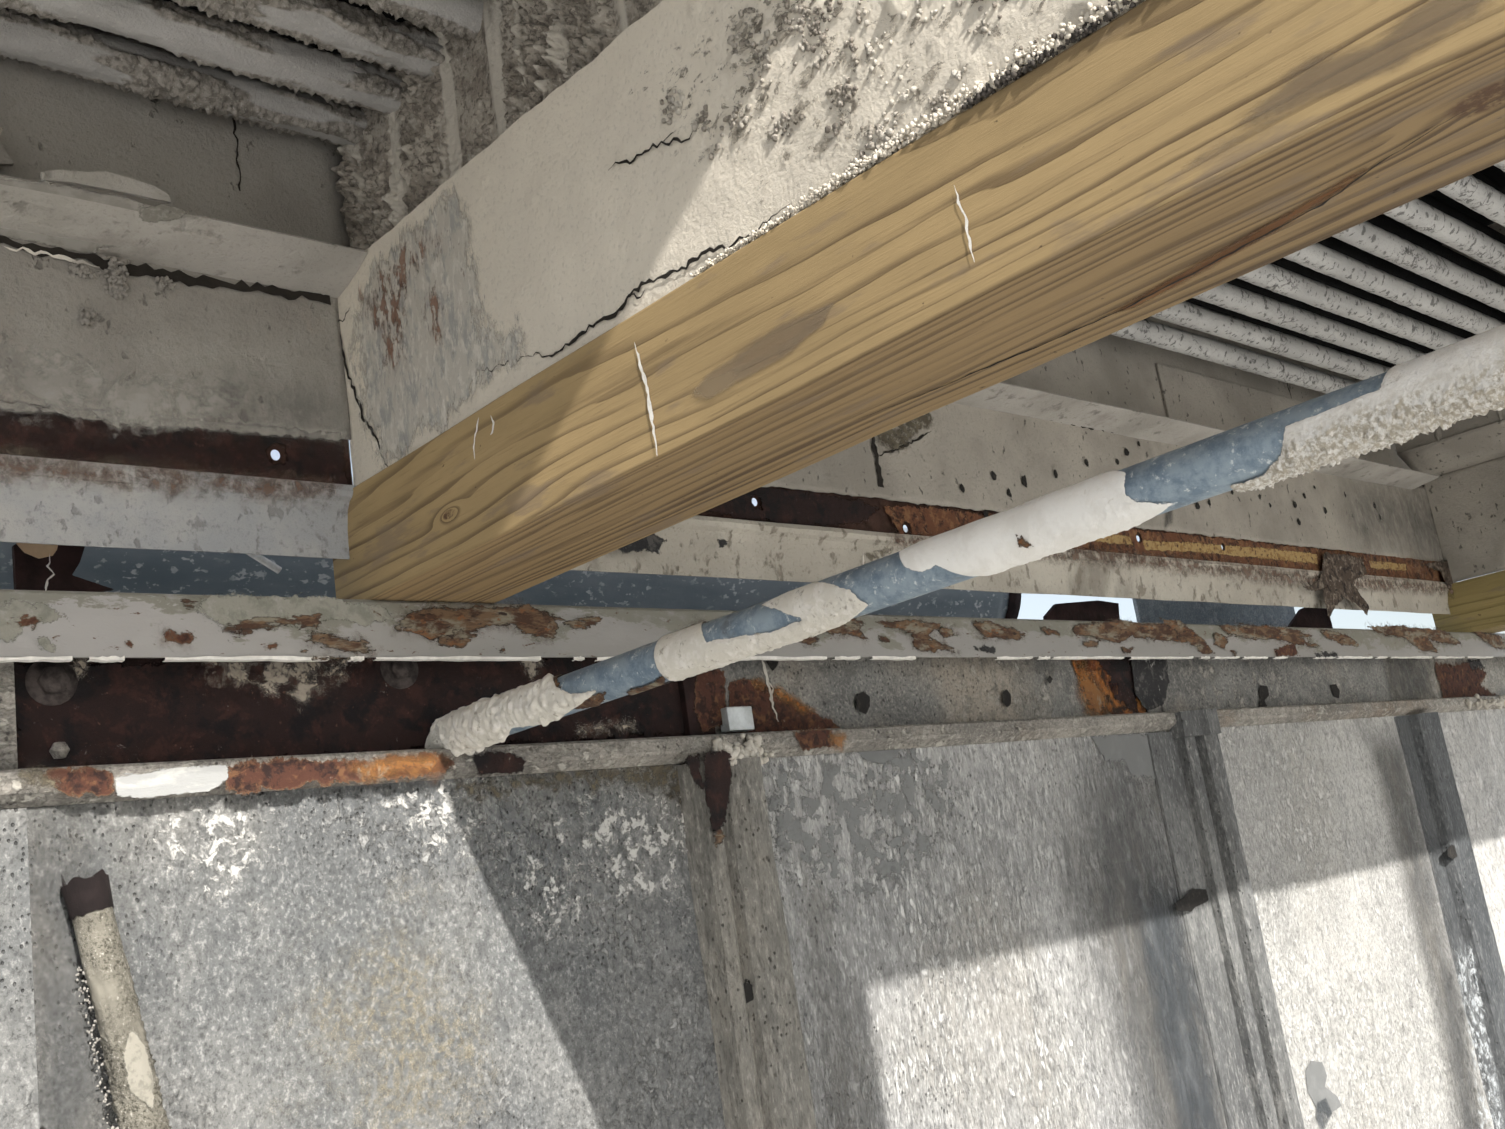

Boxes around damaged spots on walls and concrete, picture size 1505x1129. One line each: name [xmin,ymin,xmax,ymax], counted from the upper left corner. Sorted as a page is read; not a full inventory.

crack [232,118,241,191]
crack [611,131,694,168]
peeling [359,239,438,368]
peeling [425,294,442,342]
crack [482,205,788,373]
rust [0,406,349,498]
rust [706,487,994,548]
rust [1015,528,1453,595]
rust [14,640,601,798]
rust [473,668,846,776]
rust [1071,657,1147,716]
rust [1435,632,1505,698]